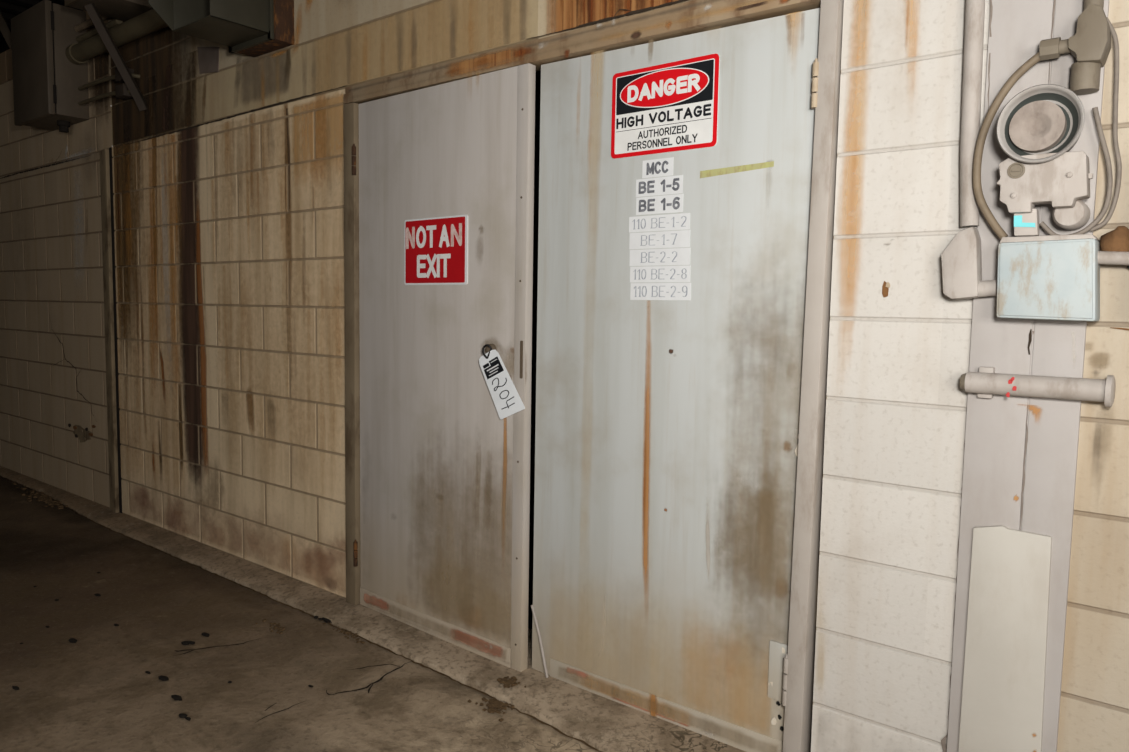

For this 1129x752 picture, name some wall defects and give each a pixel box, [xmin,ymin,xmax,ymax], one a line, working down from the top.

rust [551,0,677,32]
rust [114,134,157,346]
rust [171,127,208,481]
rust [846,75,859,276]
crack [0,476,602,752]